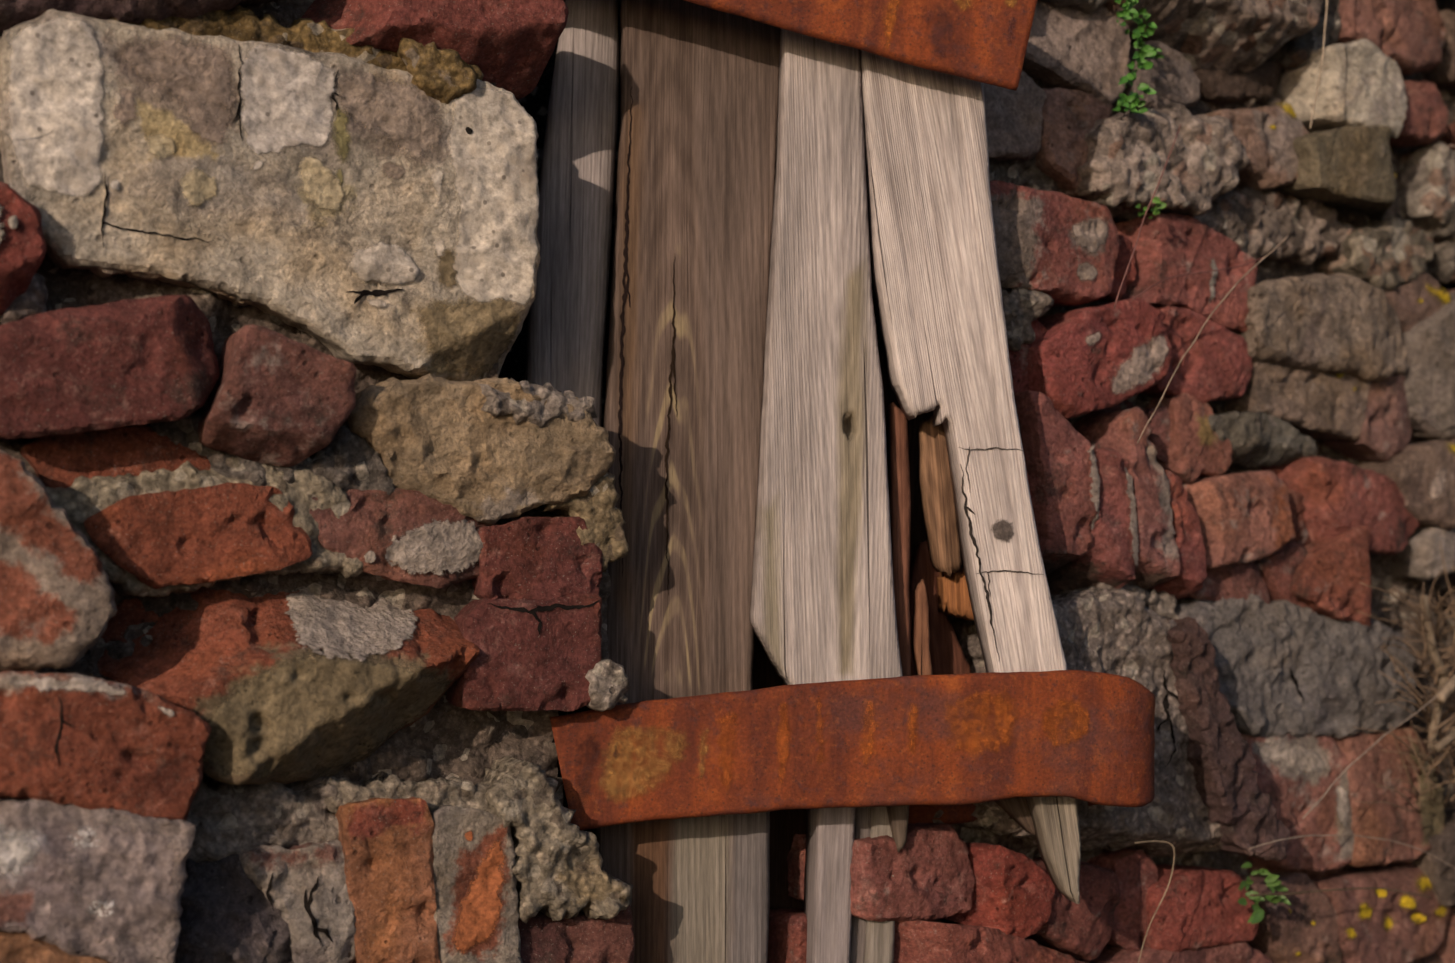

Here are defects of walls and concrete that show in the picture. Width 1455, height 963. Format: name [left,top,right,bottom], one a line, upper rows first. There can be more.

crack [231,45,244,141]
crack [101,174,214,247]
crack [618,88,633,511]
crack [664,254,677,595]
crack [488,558,623,635]
crack [266,873,333,946]